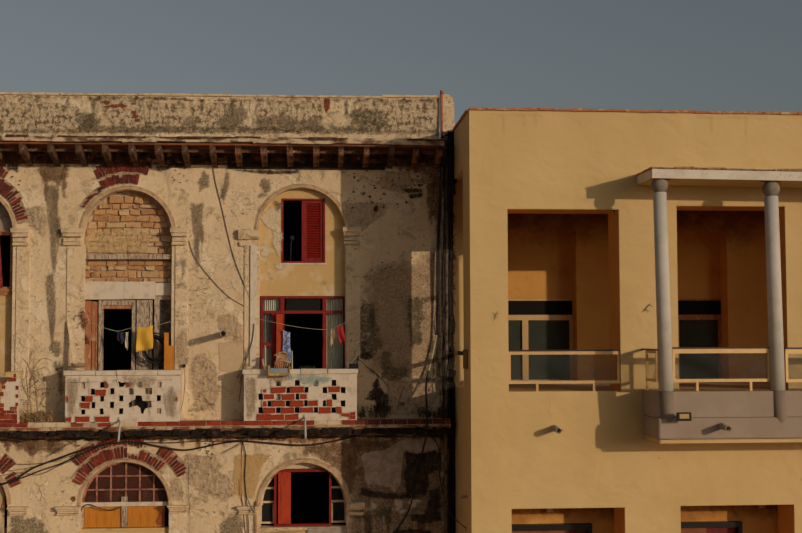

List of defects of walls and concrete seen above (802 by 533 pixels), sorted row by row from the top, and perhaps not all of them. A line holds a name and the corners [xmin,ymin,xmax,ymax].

water stain [66,100,101,131]
spalling [0,166,47,236]
spalling [80,160,149,208]
peeling [260,207,284,270]
water stain [39,164,78,414]
water stain [360,303,408,381]
water stain [407,295,439,380]
spalling [256,386,356,421]
spalling [0,453,22,488]
spalling [70,438,233,501]
water stain [242,435,449,533]
water stain [220,515,244,533]